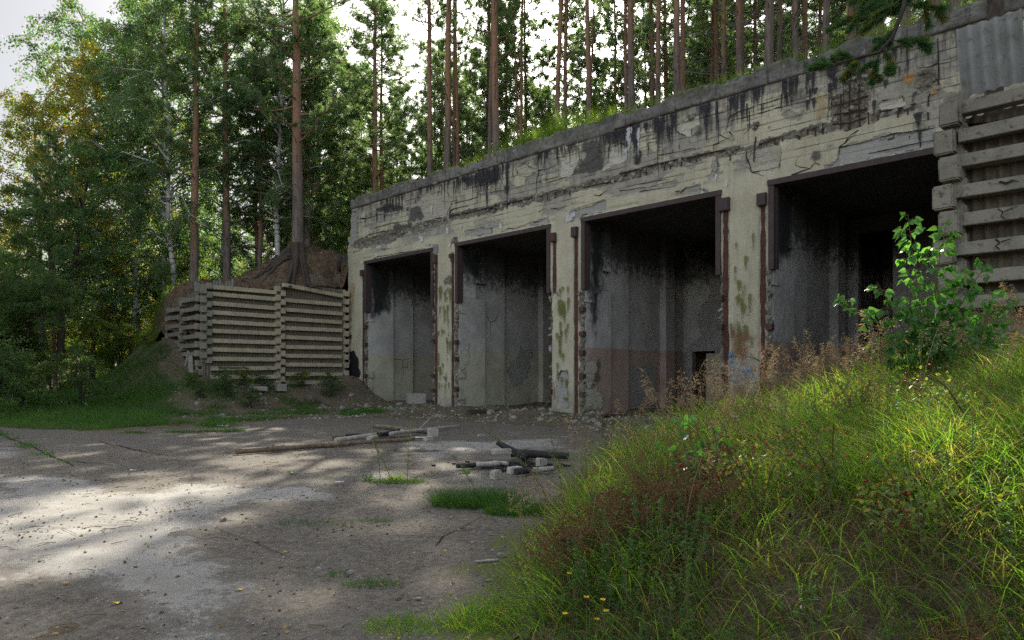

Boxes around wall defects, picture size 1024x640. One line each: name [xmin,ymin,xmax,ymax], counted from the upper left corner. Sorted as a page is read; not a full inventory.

leakage [375,162,509,242]
peeling [348,68,940,249]
crack [501,93,933,232]
leakage [695,86,764,140]
leakage [780,46,909,117]
leakage [909,92,923,146]
leakage [555,286,569,401]